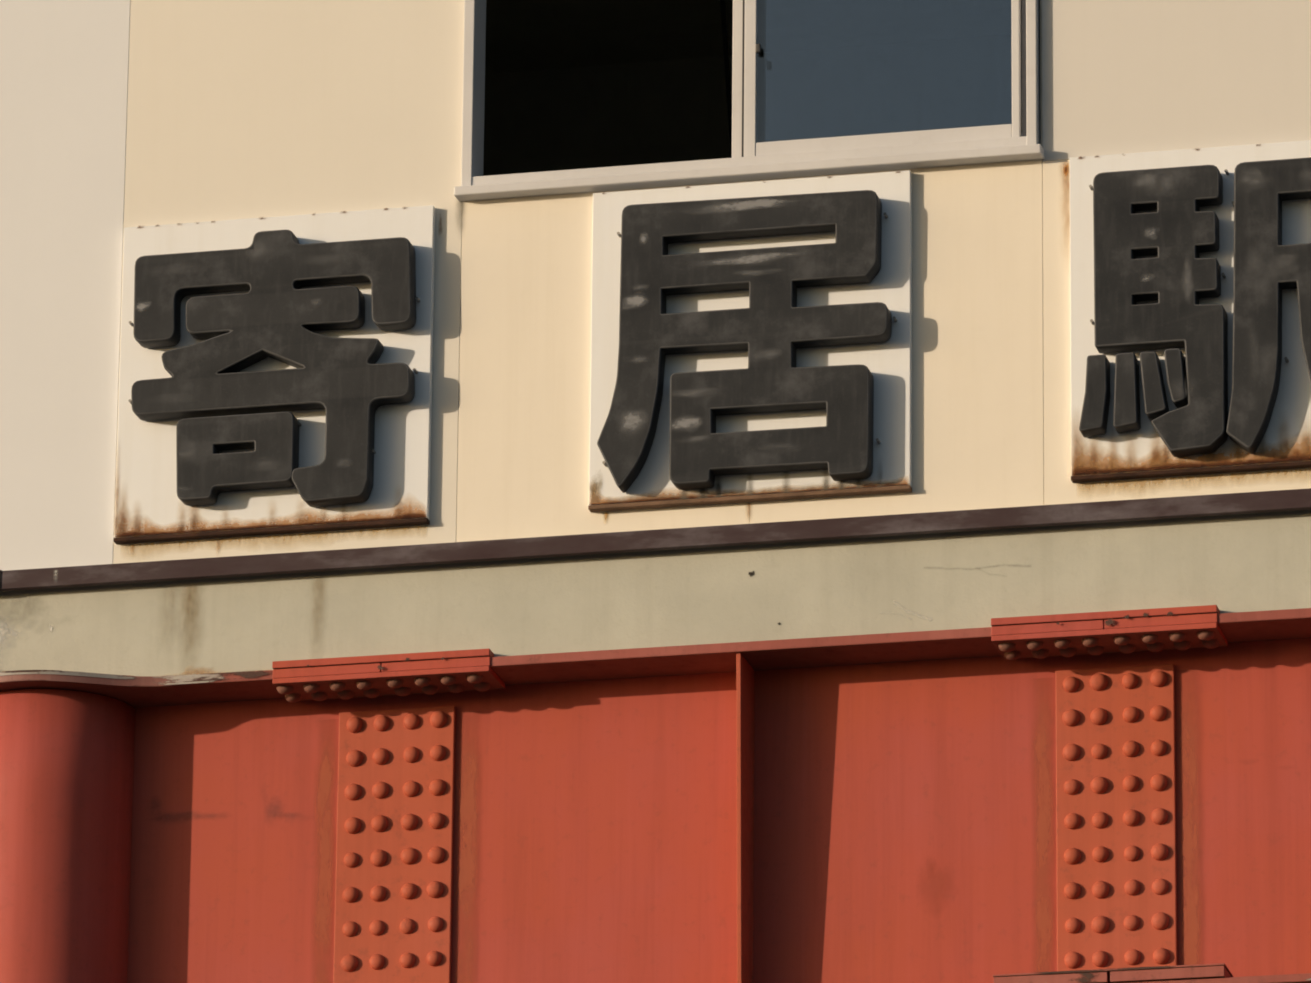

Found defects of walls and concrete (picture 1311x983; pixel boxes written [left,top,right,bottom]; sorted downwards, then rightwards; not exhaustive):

rust [1072,438,1311,489]
rust [590,480,909,520]
rust [115,504,426,548]